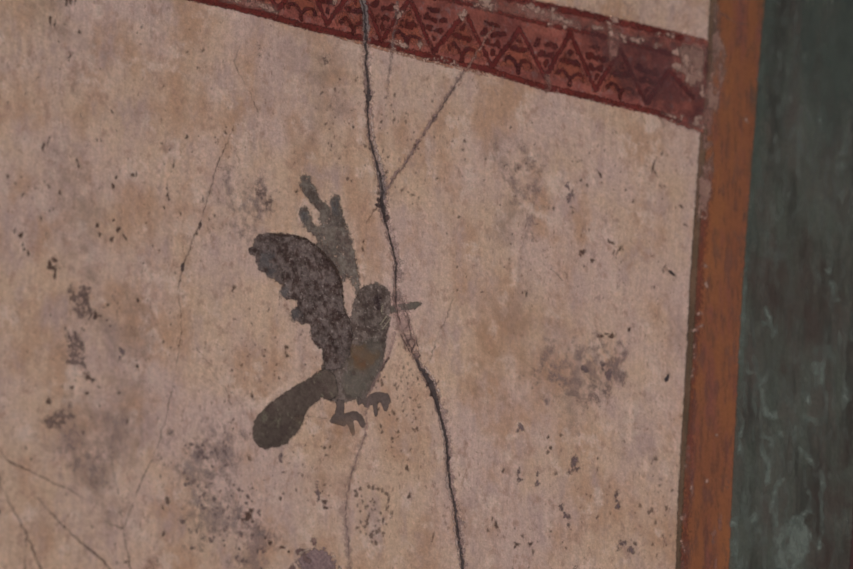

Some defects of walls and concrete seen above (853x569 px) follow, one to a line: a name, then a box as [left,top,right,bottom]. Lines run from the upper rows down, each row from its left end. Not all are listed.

peeling [592,16,644,57]
peeling [672,3,727,149]
crack [359,0,494,569]